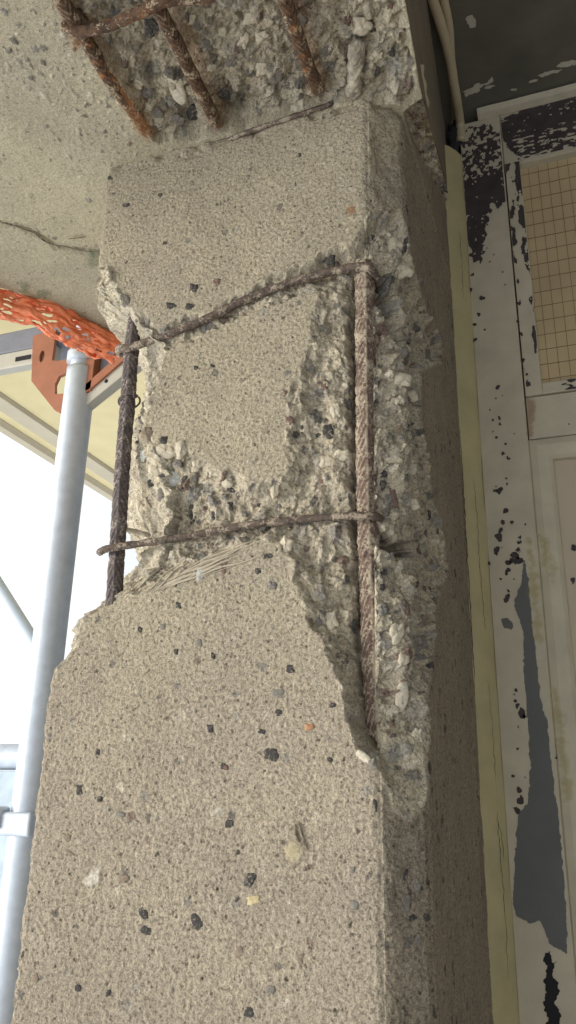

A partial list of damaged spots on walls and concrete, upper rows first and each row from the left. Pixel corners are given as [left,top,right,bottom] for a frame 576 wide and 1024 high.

peeling [465,15,476,28]
spalling [70,0,448,210]
peeling [463,77,495,98]
peeling [529,60,576,83]
peeling [461,97,576,300]
crack [2,222,95,252]
peeling [516,319,537,387]
spalling [54,207,450,824]
peeling [488,508,526,603]
peeling [513,688,527,728]
peeling [511,774,526,814]